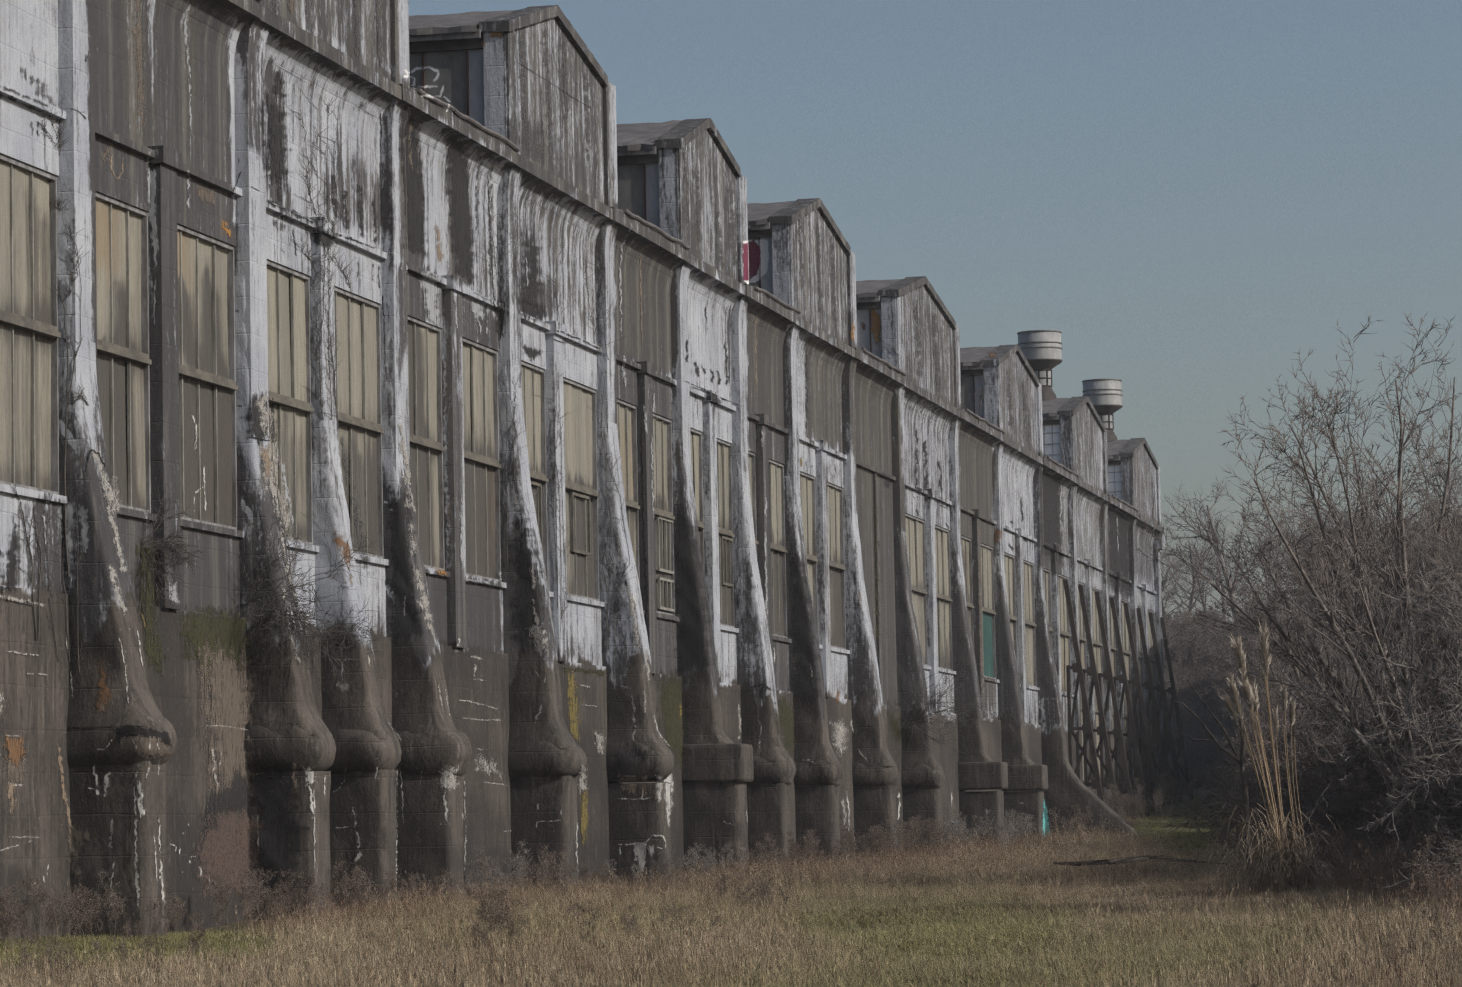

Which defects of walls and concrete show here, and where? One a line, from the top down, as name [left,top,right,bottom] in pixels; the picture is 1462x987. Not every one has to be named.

damp [266,161,315,256]
damp [475,158,505,339]
peeling [61,498,89,587]
peeling [91,449,127,615]